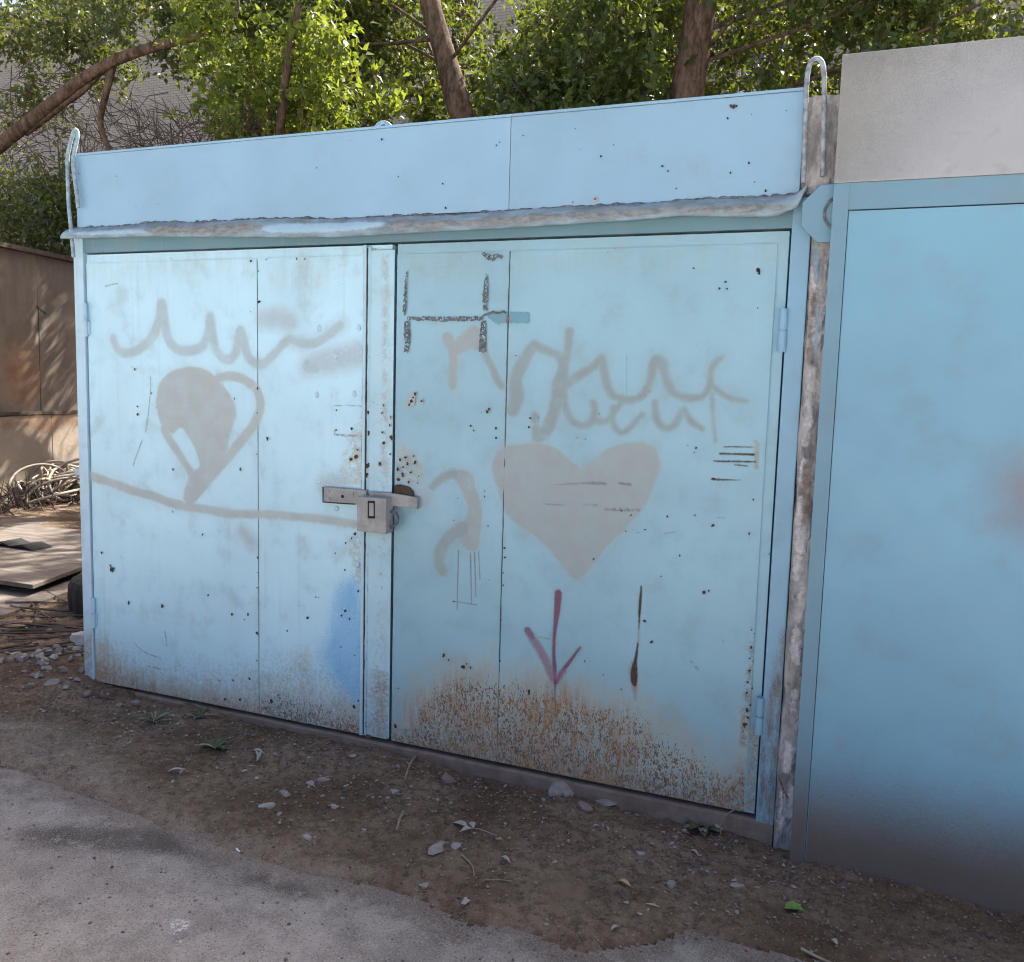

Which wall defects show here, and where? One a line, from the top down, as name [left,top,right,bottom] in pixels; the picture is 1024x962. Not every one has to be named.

peeling [402,270,529,353]
corrosion [95,536,759,813]